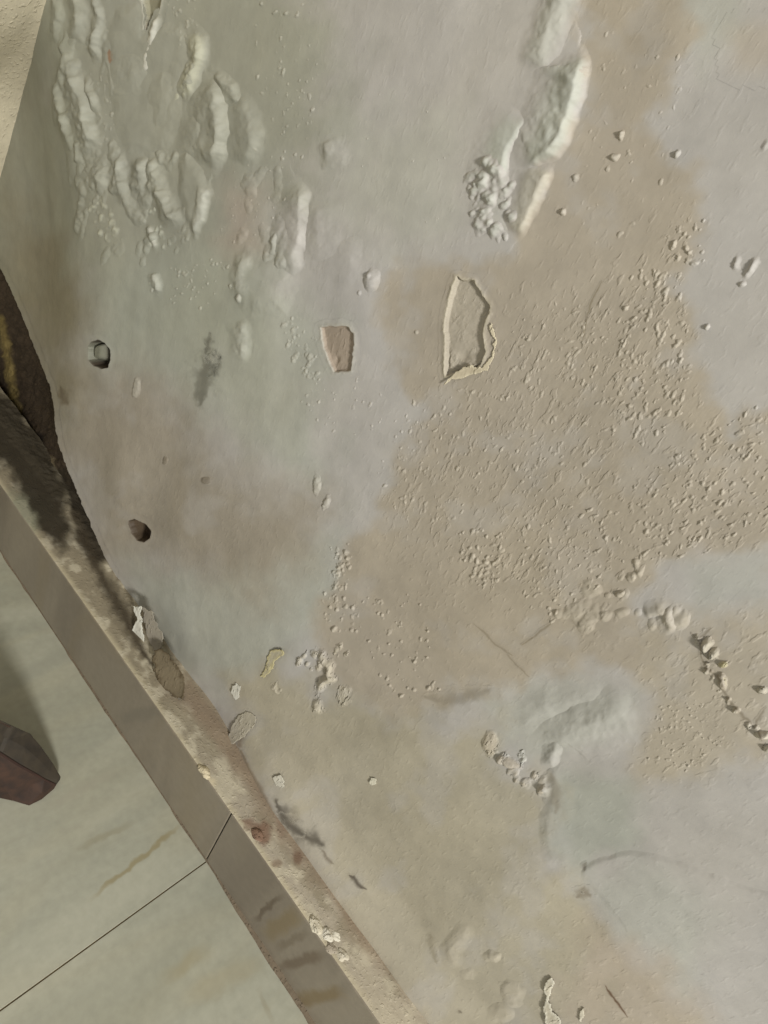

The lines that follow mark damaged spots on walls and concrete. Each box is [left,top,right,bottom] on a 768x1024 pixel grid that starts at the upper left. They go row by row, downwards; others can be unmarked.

peeling [313,318,361,379]
peeling [438,269,497,385]
flaking render [0,260,119,577]
water stain [0,168,366,671]
water stain [208,0,768,1024]
peeling [132,606,185,699]
spalling [295,641,352,715]
corrosion [239,806,296,847]
peeling [543,977,561,1024]